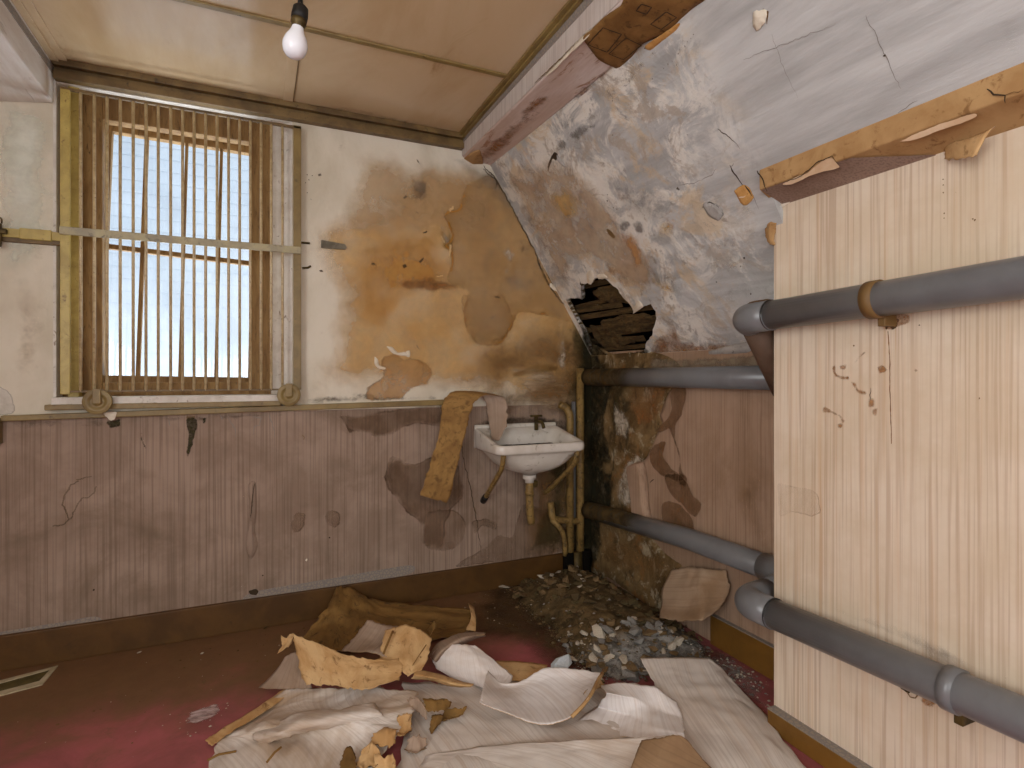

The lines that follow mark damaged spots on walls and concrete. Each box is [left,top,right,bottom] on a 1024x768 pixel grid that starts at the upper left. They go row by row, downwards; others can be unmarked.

peeling [752,9,769,31]
crack [866,17,916,113]
peeling [366,346,431,400]
leakage [330,169,648,503]
spalling [566,270,680,369]
leakage [186,416,206,454]
leakage [384,458,483,547]
leakage [533,465,597,575]
spalling [590,385,672,512]
spalling [591,520,682,612]
leakage [650,388,701,529]